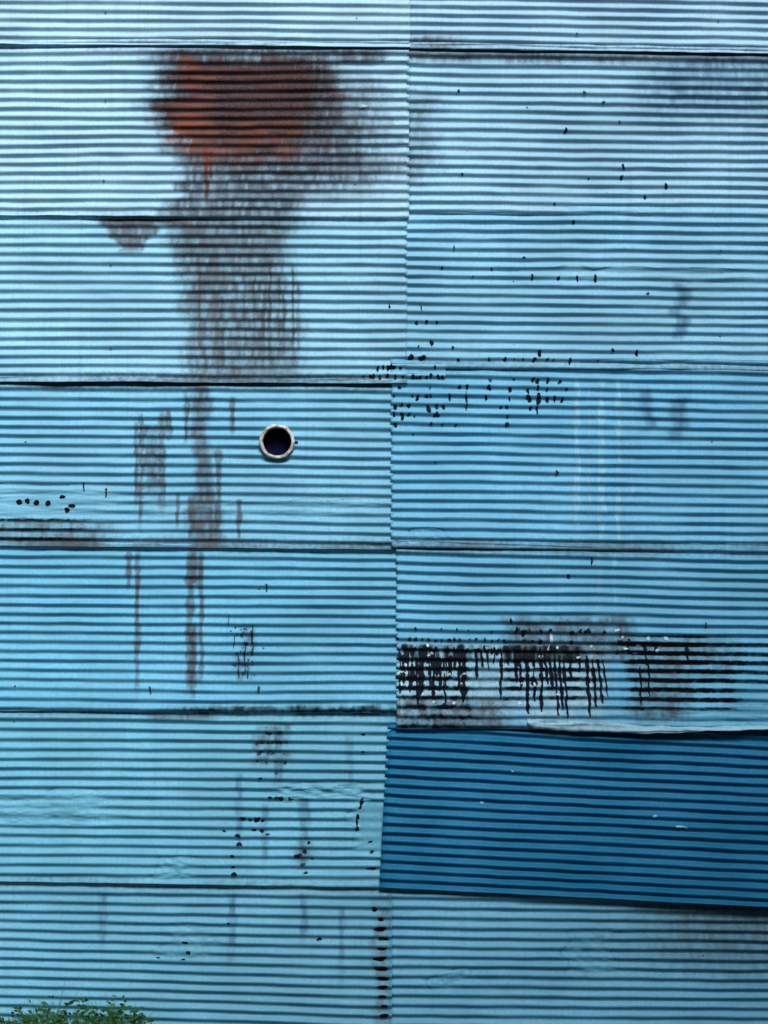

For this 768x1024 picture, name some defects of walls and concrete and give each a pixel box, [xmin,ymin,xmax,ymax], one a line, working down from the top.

rust [149,43,390,216]
leakage [614,628,768,719]